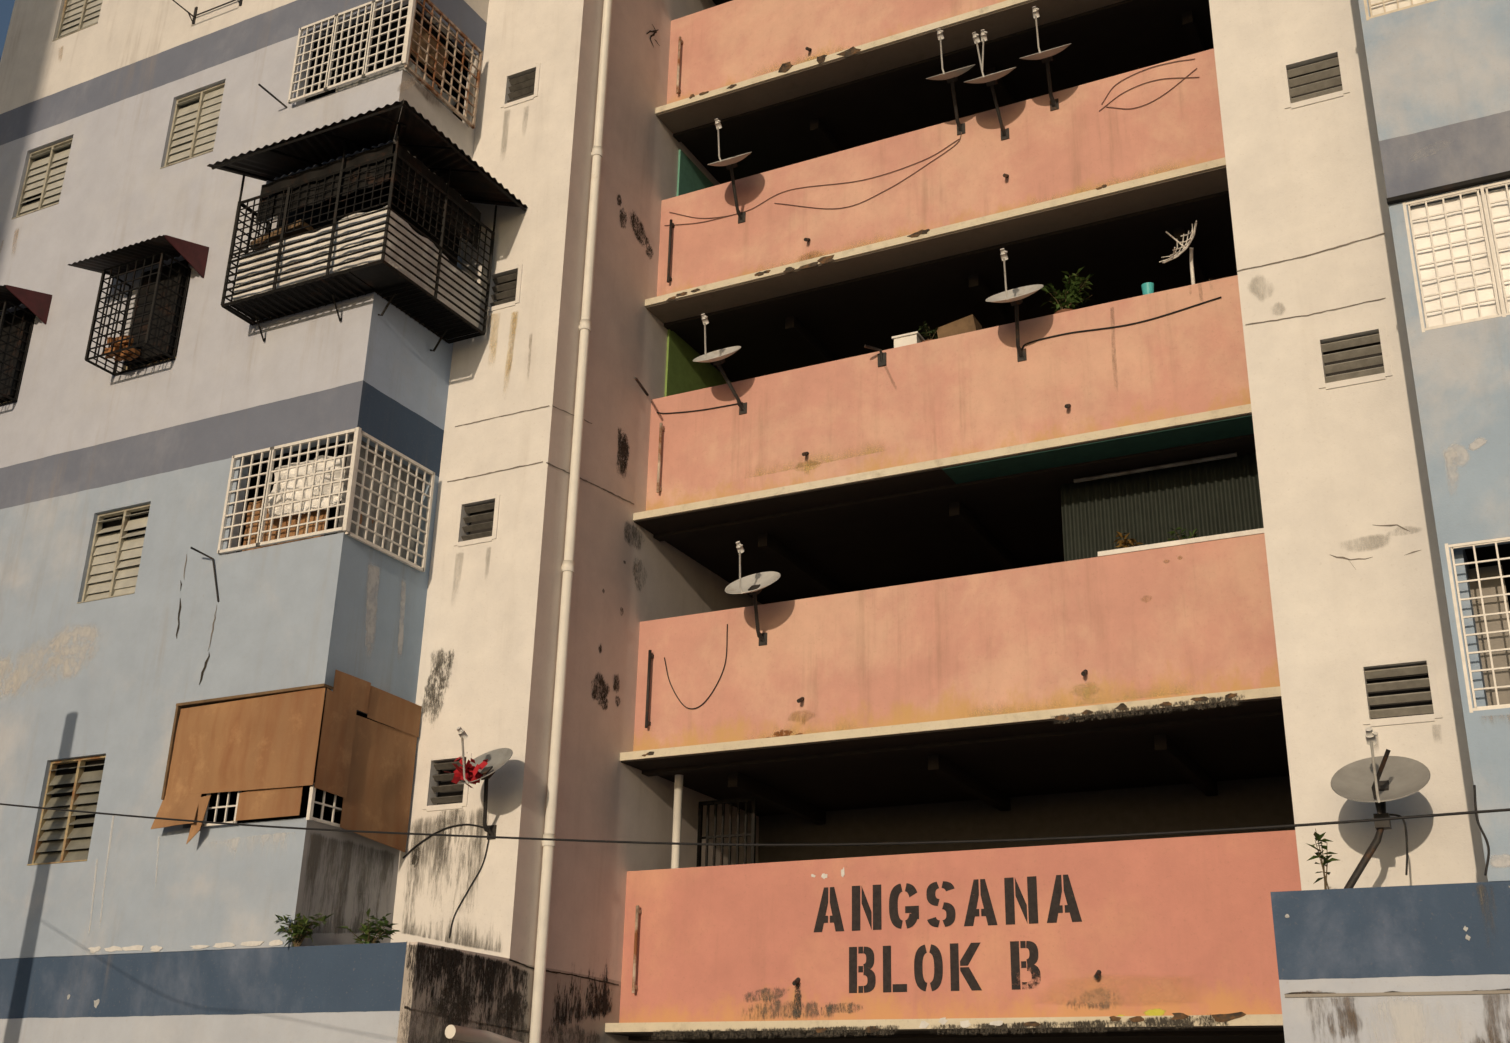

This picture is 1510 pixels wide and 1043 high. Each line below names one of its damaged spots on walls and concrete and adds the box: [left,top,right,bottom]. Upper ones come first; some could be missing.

damp [617,428,629,476]
crack [176,554,217,685]
damp [422,650,454,720]
damp [591,674,620,709]
spalling [1190,693,1237,701]
damp [306,809,484,933]
damp [390,921,529,1043]
damp [546,965,612,1043]
damp [649,983,898,1040]
damp [936,976,1227,1035]
damp [1332,997,1357,1036]
damp [1479,995,1510,1043]